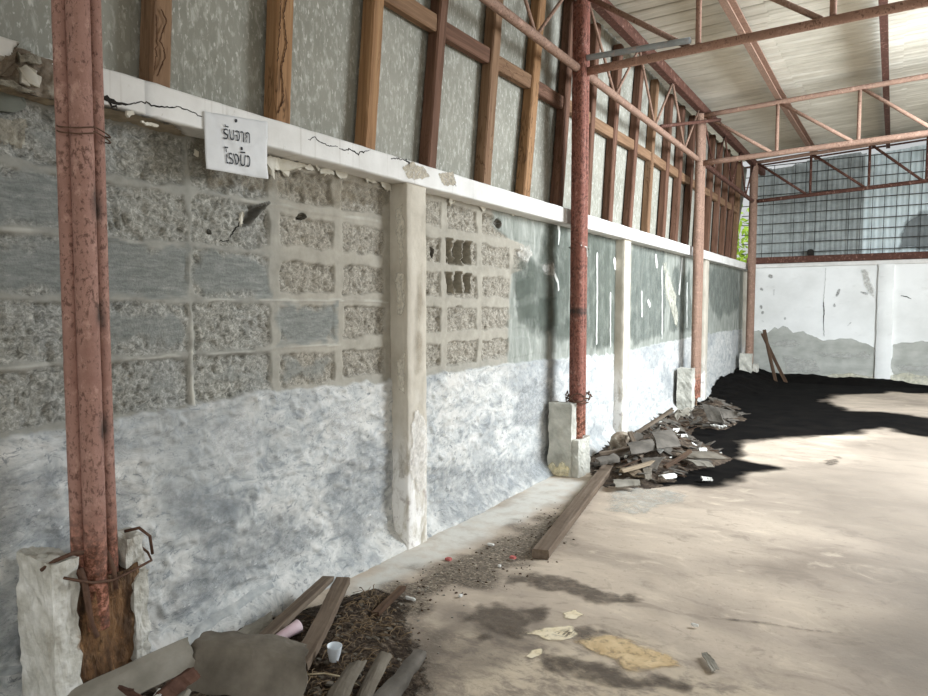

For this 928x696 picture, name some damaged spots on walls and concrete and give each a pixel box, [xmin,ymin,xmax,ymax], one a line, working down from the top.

spalling [0,44,54,113]
crack [104,95,202,117]
spalling [238,201,271,227]
peeling [209,155,392,204]
crack [308,137,369,156]
peeling [403,162,456,186]
damp [516,223,570,338]
damp [587,233,616,347]
peeling [410,410,428,489]
corrosion [77,562,139,684]